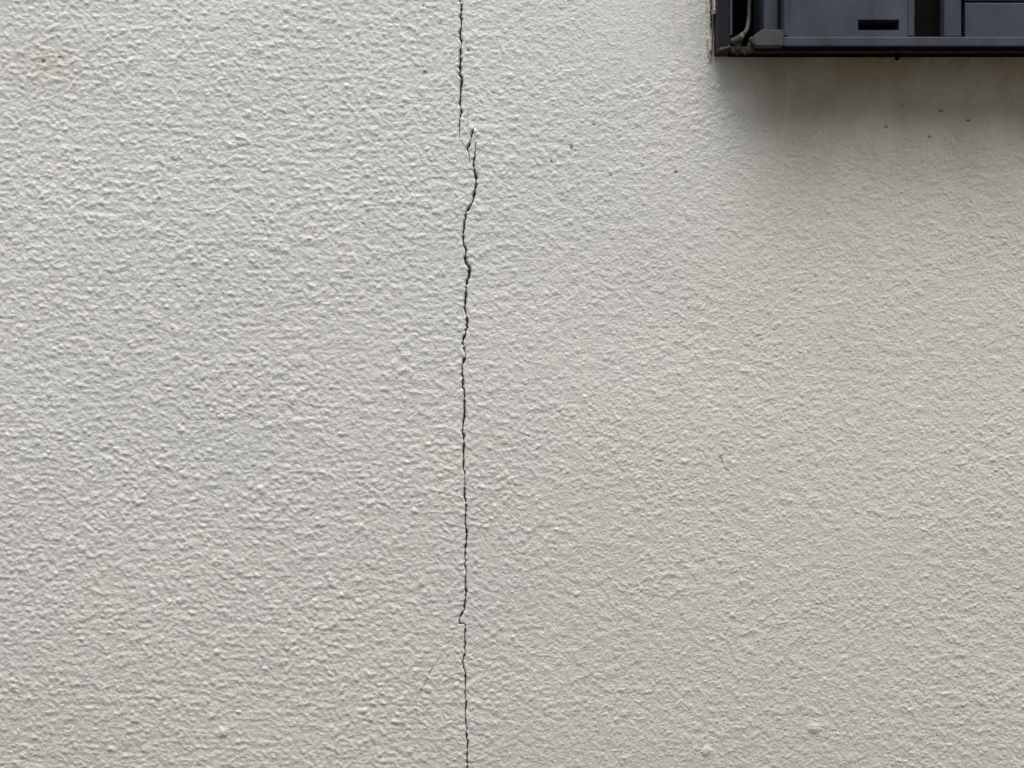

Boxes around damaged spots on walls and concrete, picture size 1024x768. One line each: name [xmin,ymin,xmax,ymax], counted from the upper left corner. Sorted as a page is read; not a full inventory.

crack [391,0,478,768]